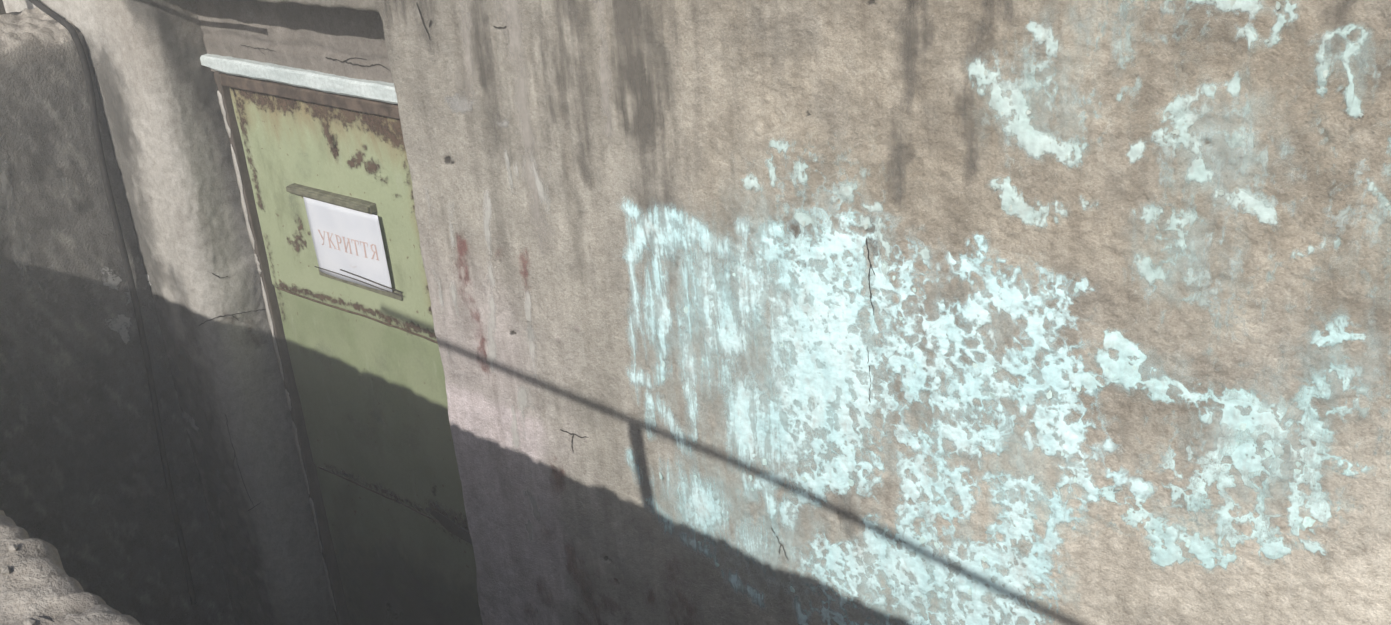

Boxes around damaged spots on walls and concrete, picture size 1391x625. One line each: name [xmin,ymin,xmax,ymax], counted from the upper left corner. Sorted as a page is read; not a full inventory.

crack [416,3,432,41]
water stain [556,0,656,179]
water stain [902,0,915,97]
peeling [968,21,1101,168]
peeling [1146,0,1298,49]
peeling [1315,24,1380,118]
peeling [1127,72,1288,327]
peeling [622,127,1391,625]